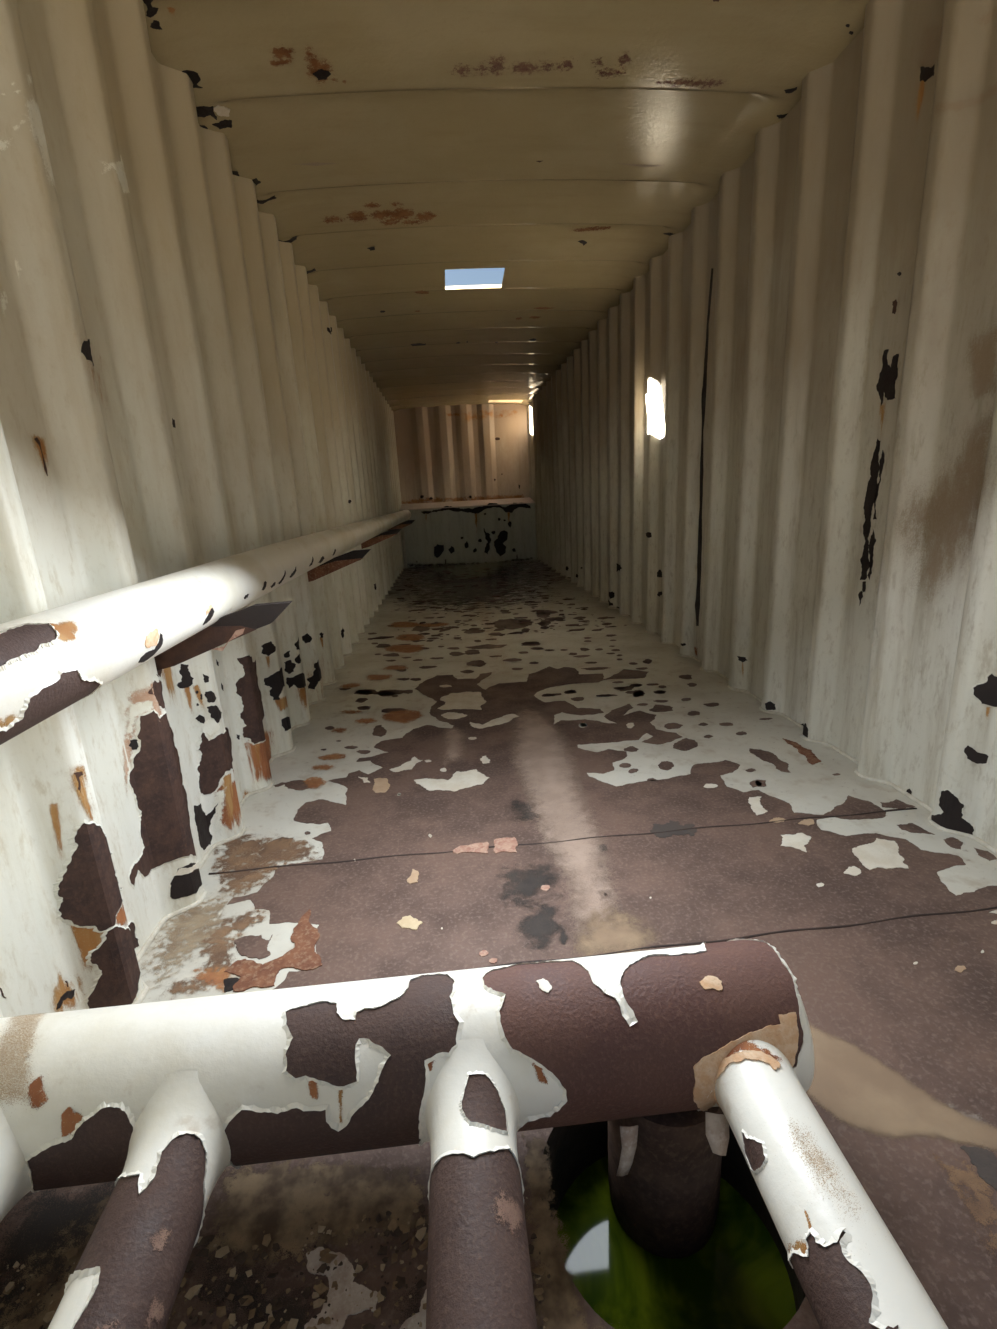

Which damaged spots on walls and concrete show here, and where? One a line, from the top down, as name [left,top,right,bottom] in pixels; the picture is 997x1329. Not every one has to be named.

rust [266,45,347,92]
rust [450,46,641,82]
rust [322,200,438,226]
peeling [858,349,899,606]
peeling [422,503,531,558]
peeling [203,604,214,625]
peeling [0,610,997,1329]